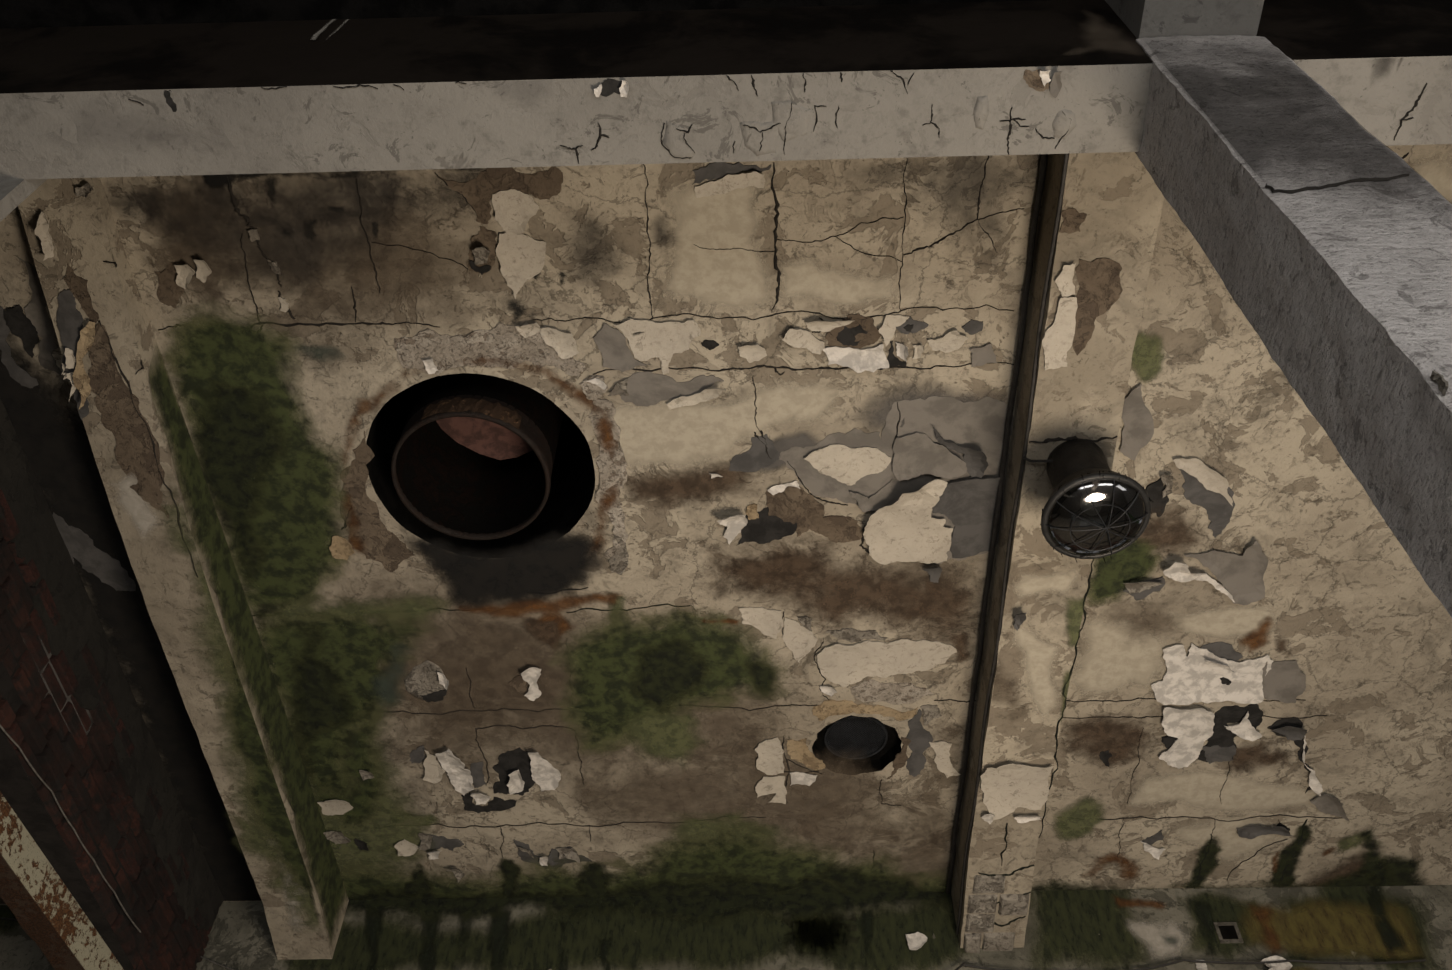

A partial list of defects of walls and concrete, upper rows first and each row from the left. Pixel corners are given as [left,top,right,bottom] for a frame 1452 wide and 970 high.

peeling [435,166,563,299]
spalling [782,313,997,373]
peeling [1042,258,1123,371]
leakage [193,383,284,572]
leakage [394,300,817,575]
peeling [709,396,1014,583]
peeling [1123,458,1268,605]
leakage [225,653,313,891]
leakage [282,594,624,824]
peeling [409,745,561,813]
leakage [340,640,953,970]
peeling [1151,642,1349,821]